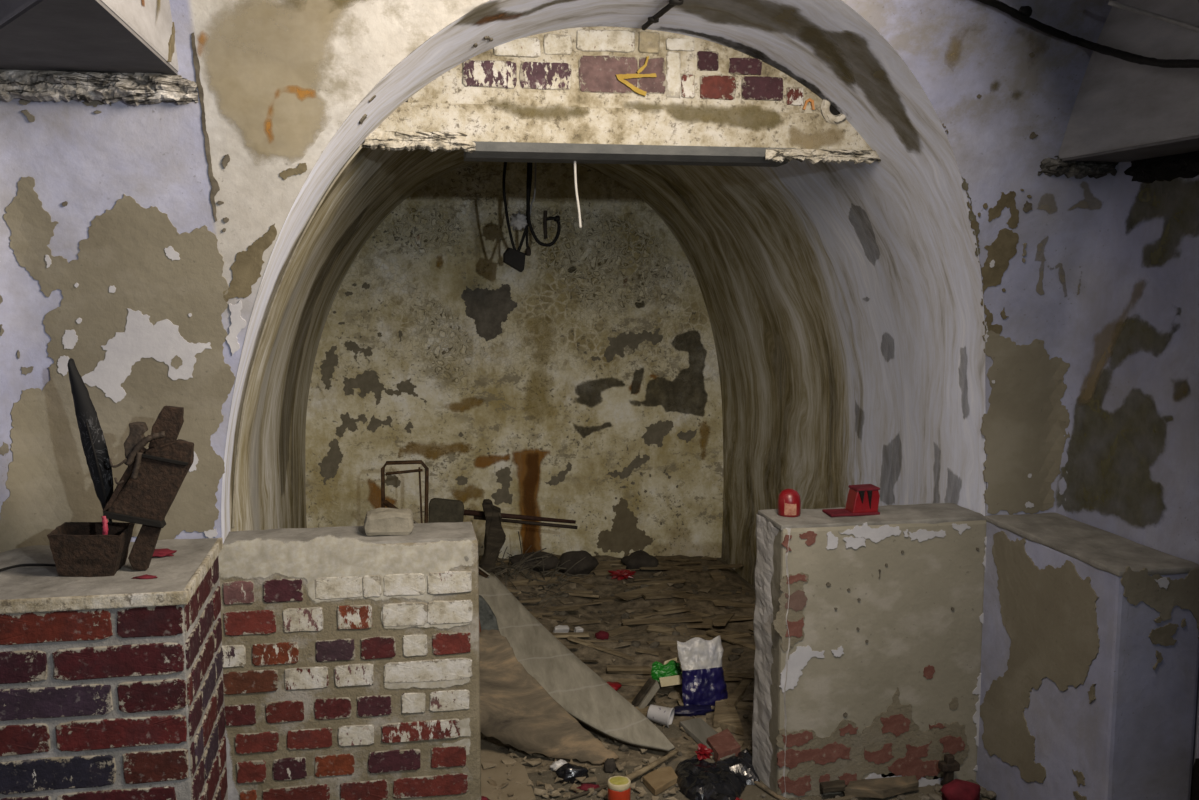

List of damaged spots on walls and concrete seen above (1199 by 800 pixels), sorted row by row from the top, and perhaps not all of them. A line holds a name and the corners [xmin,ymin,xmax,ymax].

damp [457,0,575,25]
spalling [0,22,198,122]
corrosion [265,87,314,139]
spalling [1038,151,1199,183]
peeling [0,176,277,553]
peeling [318,332,427,485]
flaking render [461,284,517,341]
peeling [962,177,1070,515]
corrosion [399,443,550,554]
peeling [491,467,513,505]
peeling [594,420,697,556]
peeling [773,531,1100,800]